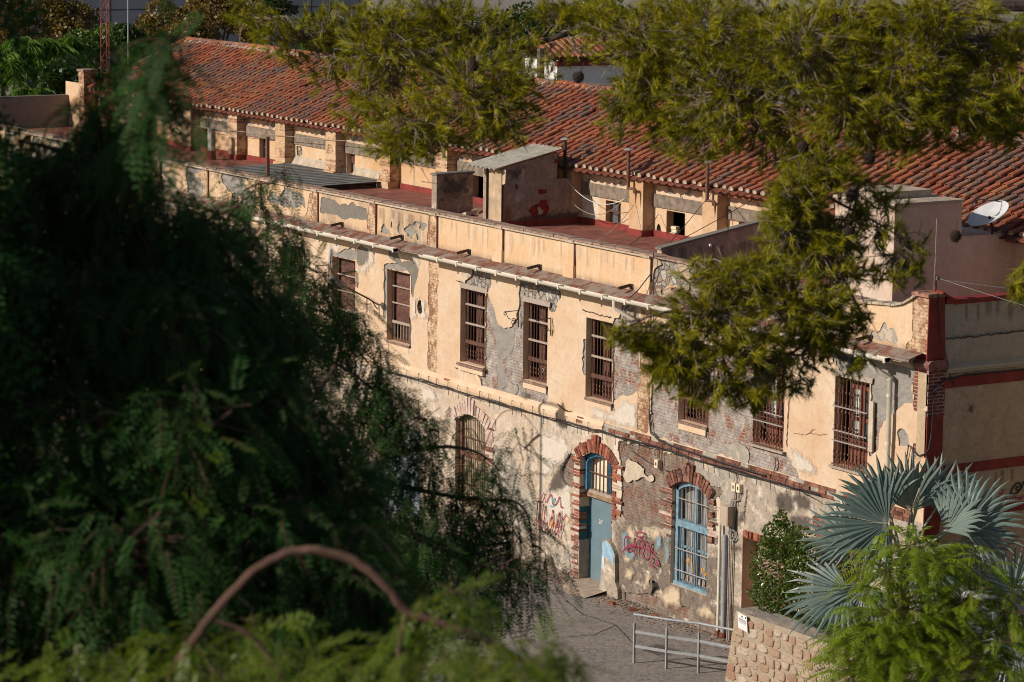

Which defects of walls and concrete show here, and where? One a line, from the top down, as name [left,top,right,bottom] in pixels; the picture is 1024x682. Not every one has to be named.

spalling [153,162,203,196]
spalling [529,189,549,219]
spalling [367,208,430,245]
flaking render [465,270,561,404]
flaking render [870,296,929,354]
crack [946,323,1024,340]
flaking render [612,305,799,545]